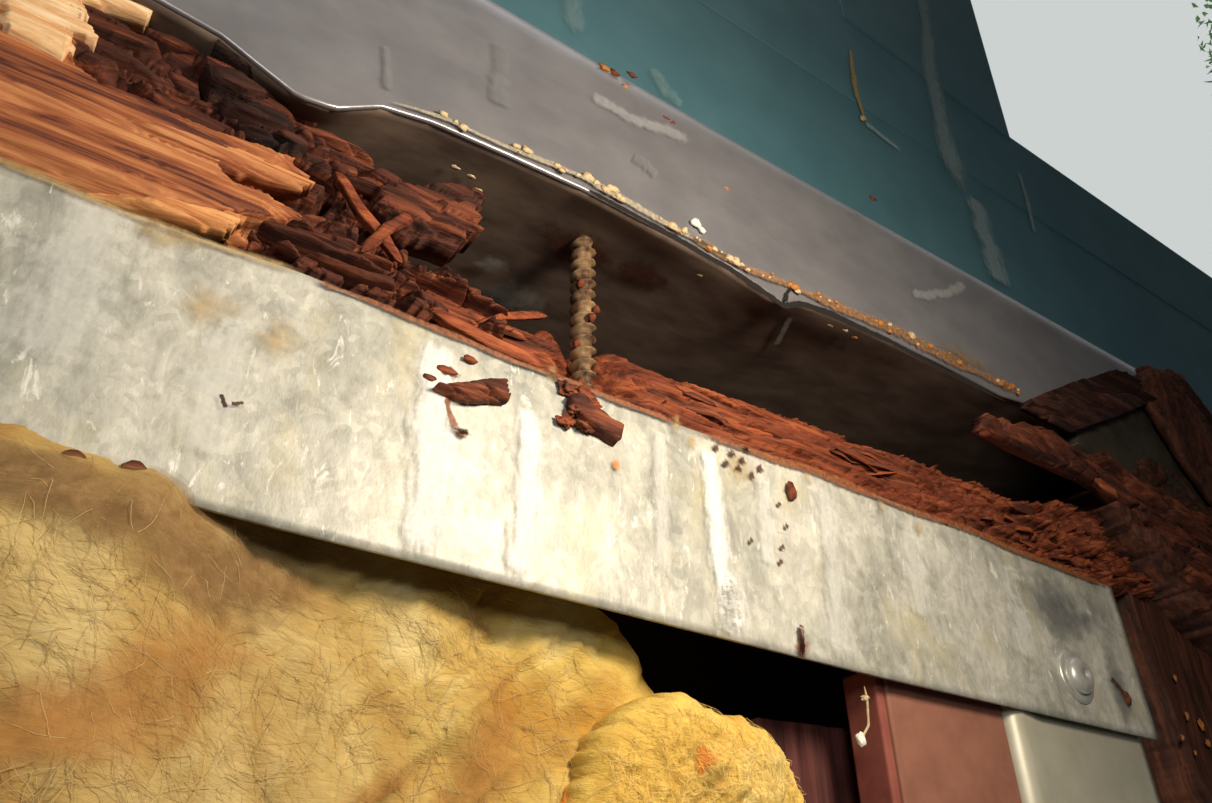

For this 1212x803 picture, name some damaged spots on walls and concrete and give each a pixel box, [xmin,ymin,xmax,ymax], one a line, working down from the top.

corrosion [599,62,638,89]
corrosion [0,157,280,267]
corrosion [397,103,1021,396]
water stain [403,345,456,550]
corrosion [445,397,472,437]
corrosion [322,282,680,426]
water stain [506,410,541,572]
water stain [702,451,745,629]
corrosion [692,434,1106,586]
corrosion [797,624,809,659]
corrosion [1111,677,1132,706]